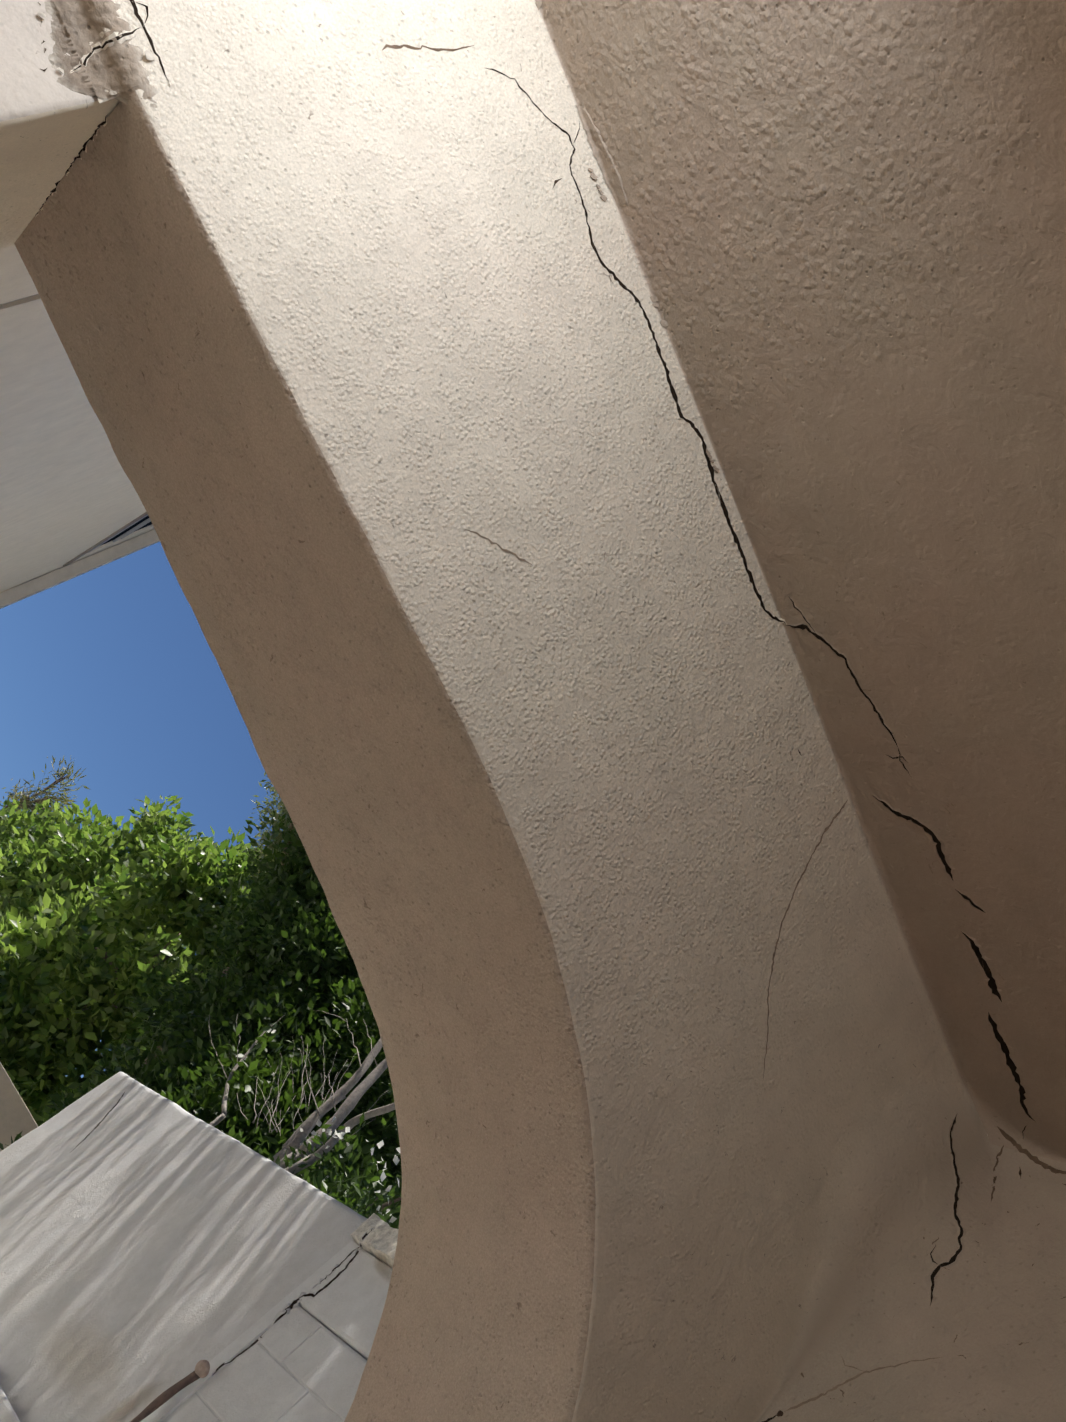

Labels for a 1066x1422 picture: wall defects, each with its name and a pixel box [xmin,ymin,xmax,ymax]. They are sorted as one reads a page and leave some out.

flaking render [37,0,158,108]
crack [382,44,1066,1306]
crack [761,1356,942,1422]